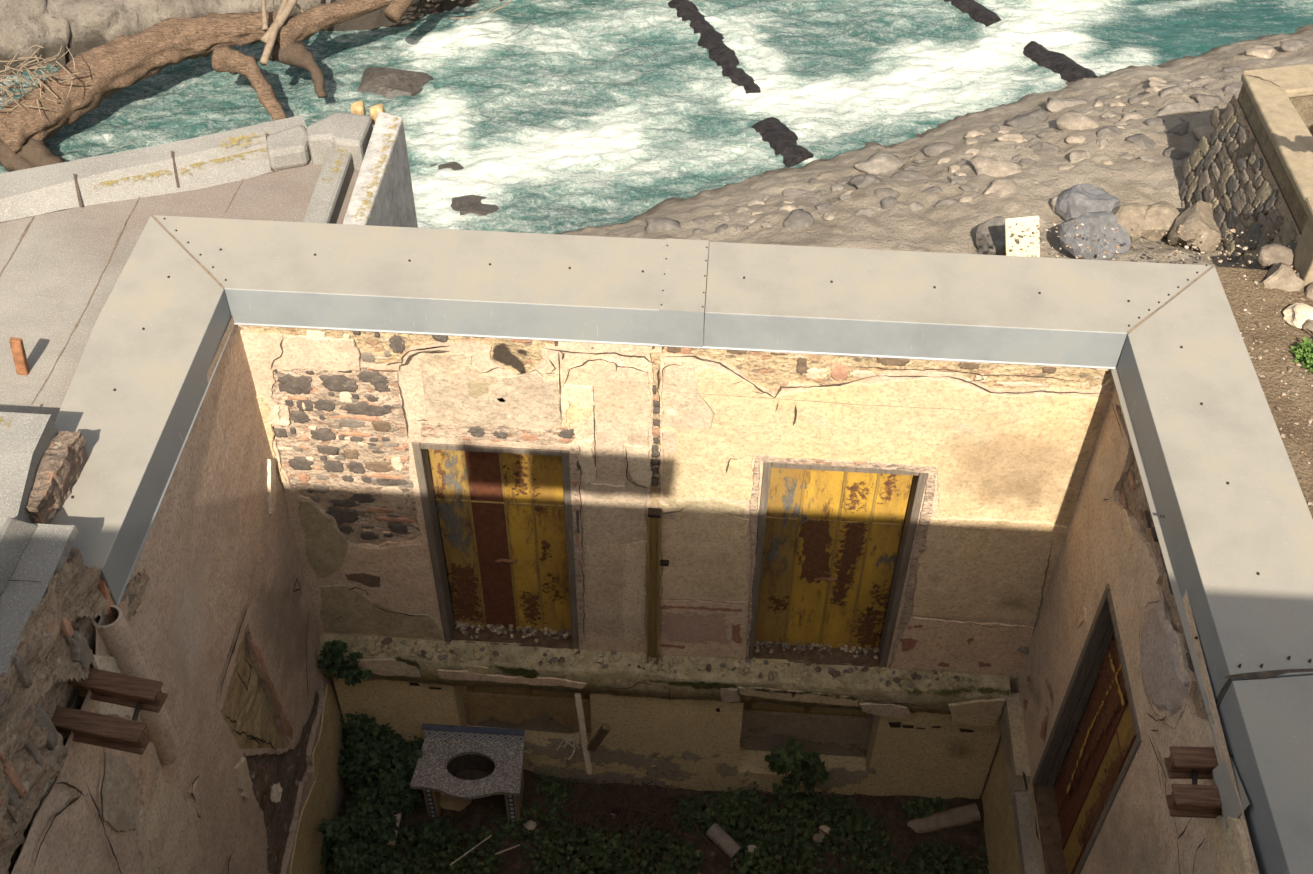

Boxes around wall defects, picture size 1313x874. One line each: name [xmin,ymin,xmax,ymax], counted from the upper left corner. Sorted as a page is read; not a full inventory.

spalling [0,561,151,874]
peeling [437,669,587,688]
peeling [240,325,1110,678]
crack [482,348,1124,639]
peeling [948,698,1006,726]
spalling [1119,454,1211,729]
peeling [1212,815,1253,874]